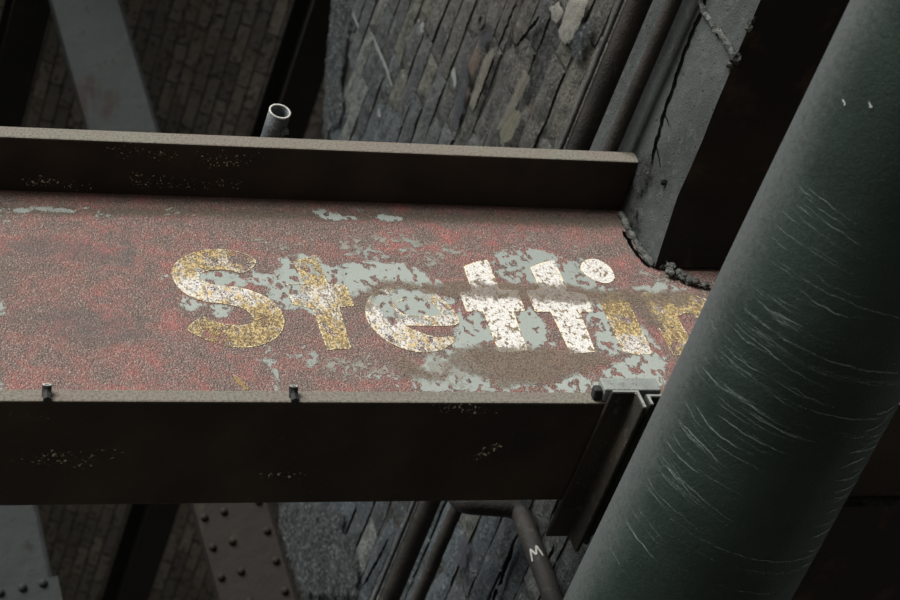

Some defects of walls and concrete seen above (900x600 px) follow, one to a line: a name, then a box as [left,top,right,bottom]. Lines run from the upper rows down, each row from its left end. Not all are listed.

crack [650,0,705,174]
peeling [180,295,233,319]
peeling [197,208,710,393]
rust [357,279,702,328]
rust [392,342,610,389]